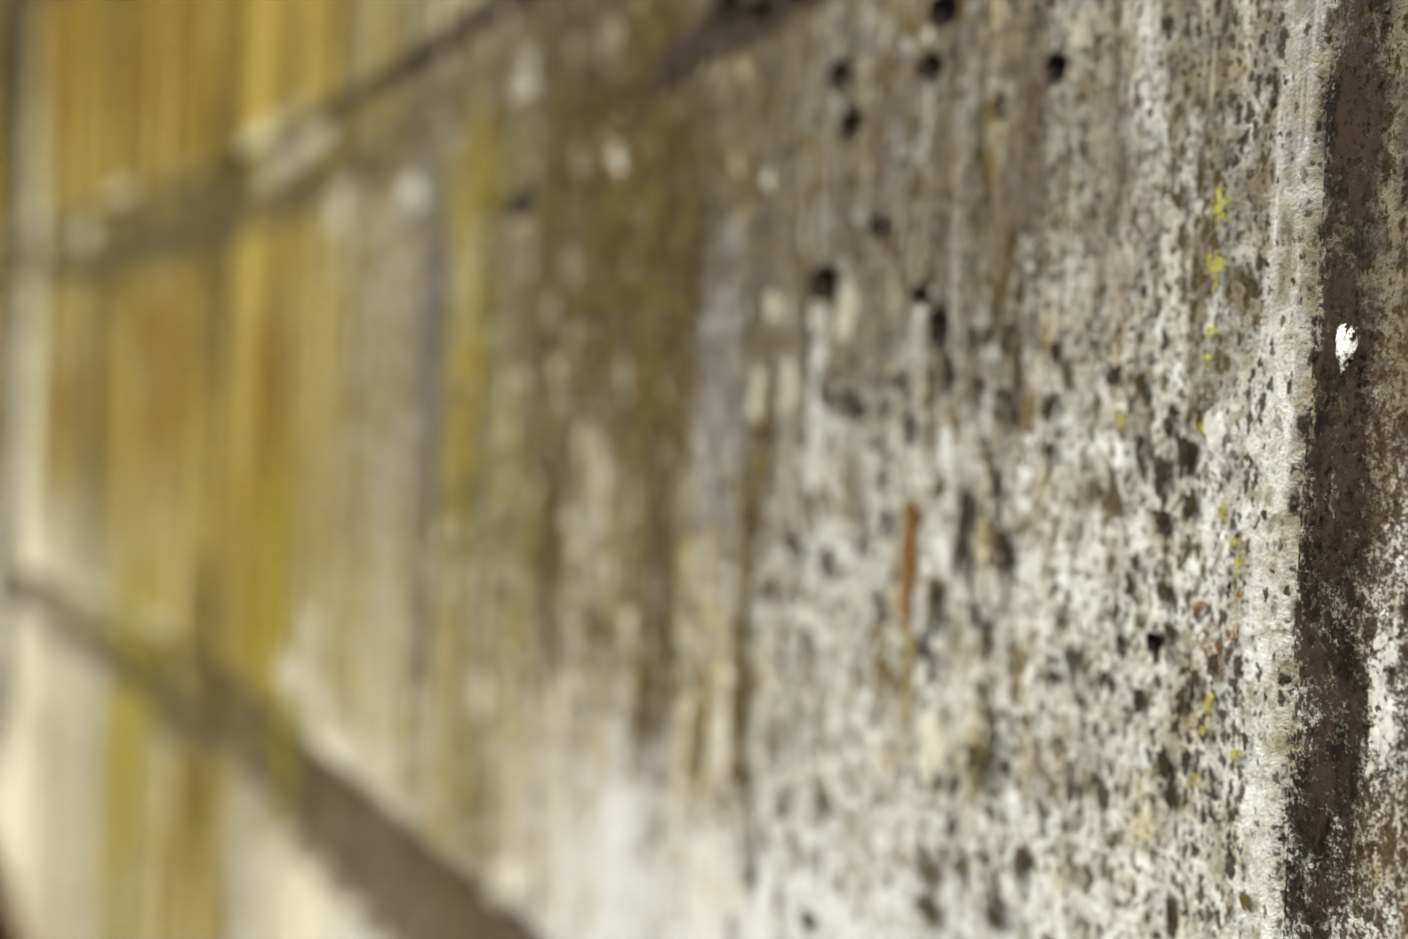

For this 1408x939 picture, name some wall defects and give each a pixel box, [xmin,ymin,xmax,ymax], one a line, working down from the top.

corrosion [898,496,919,751]
damp [1268,0,1392,939]